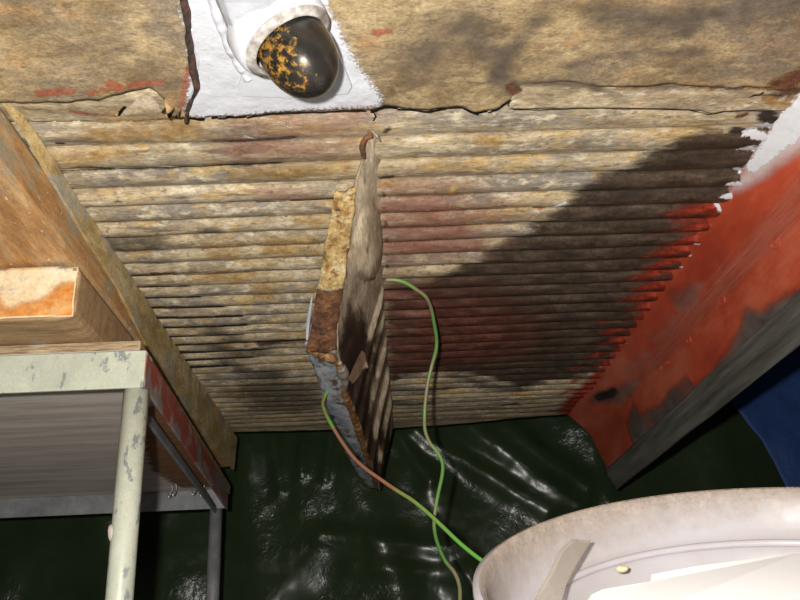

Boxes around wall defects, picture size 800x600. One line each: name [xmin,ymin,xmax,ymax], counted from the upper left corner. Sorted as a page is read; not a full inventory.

crack [189,92,781,121]
leakage [382,111,800,412]
corrosion [338,304,391,489]